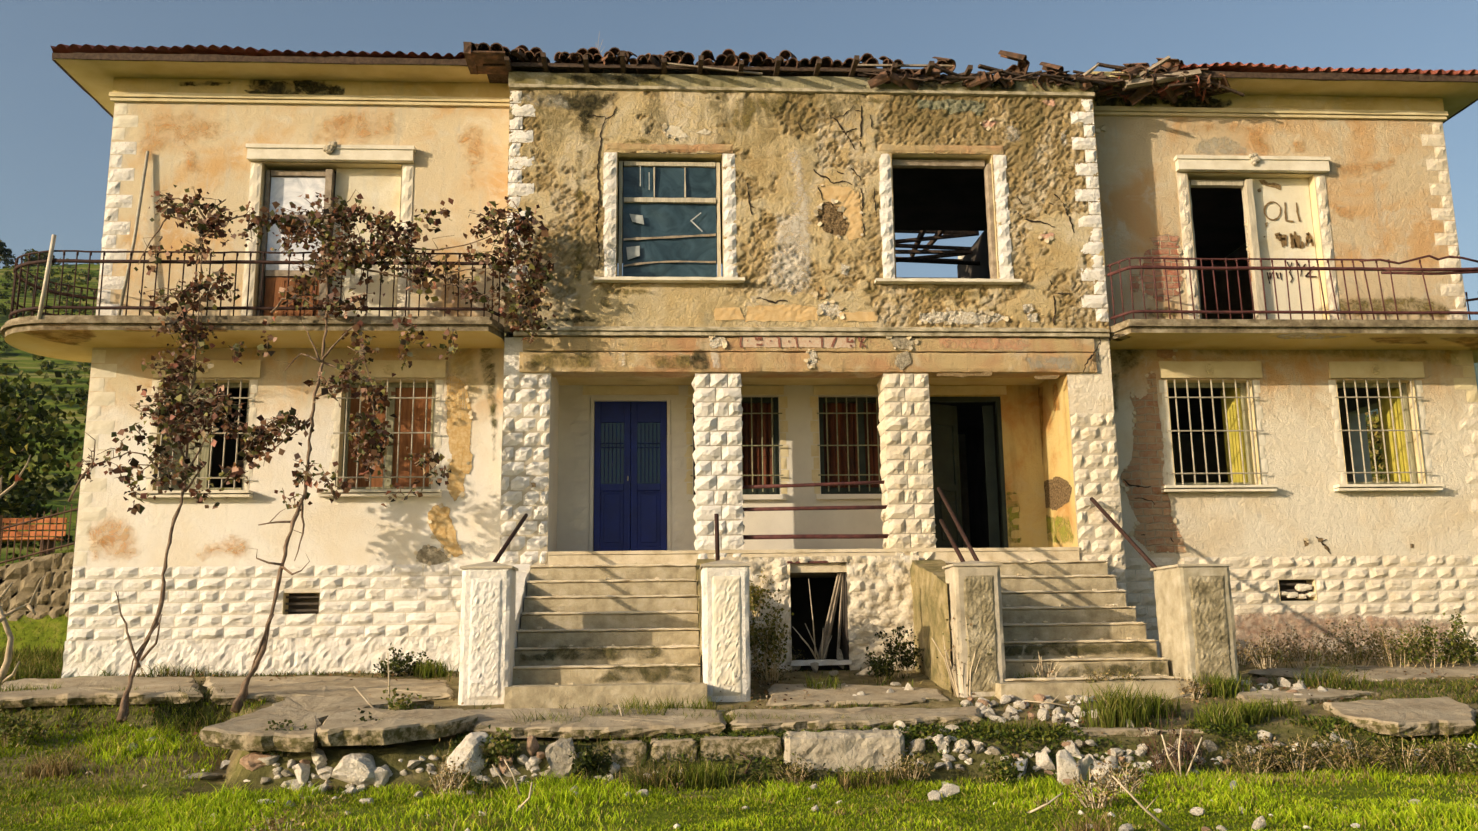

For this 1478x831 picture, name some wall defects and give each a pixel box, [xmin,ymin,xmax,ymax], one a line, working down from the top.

peeling [662,123,711,140]
peeling [980,117,997,131]
peeling [813,183,863,241]
flaking render [1130,234,1186,302]
peeling [708,287,878,349]
spalling [804,349,818,369]
spalling [886,304,1038,371]
peeling [414,373,473,566]
spalling [1044,476,1072,510]
flaking render [1120,349,1189,554]